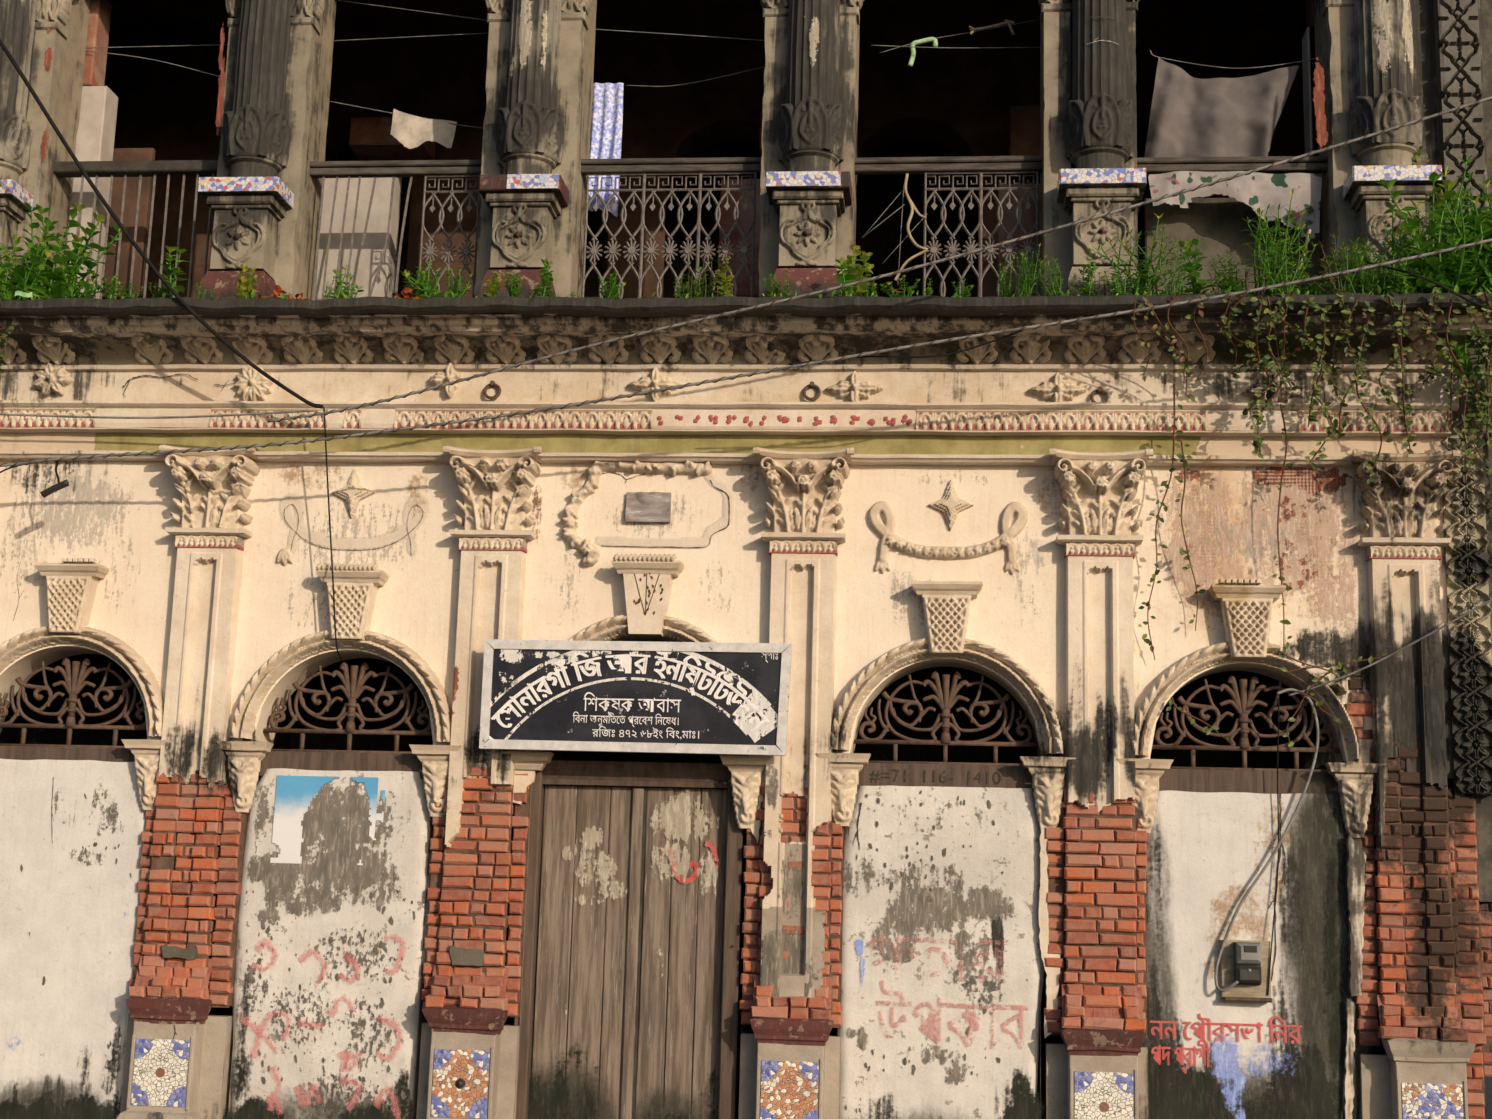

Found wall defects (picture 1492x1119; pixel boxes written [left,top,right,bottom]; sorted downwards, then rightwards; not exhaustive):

leakage [1280,519,1451,785]
leakage [0,1028,122,1119]
peeling [69,763,536,1118]
peeling [650,790,719,894]
peeling [740,787,1015,1085]
flaking render [1038,787,1147,1038]
flaking render [1344,667,1492,1119]